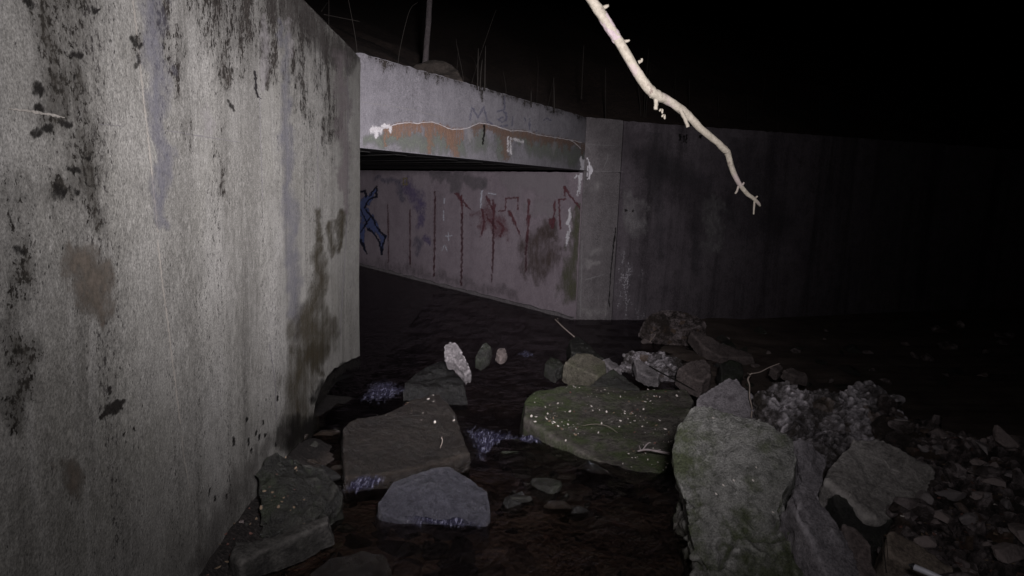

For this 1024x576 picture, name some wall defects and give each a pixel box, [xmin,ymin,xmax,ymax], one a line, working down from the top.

water stain [29,0,103,232]
water stain [155,0,586,452]
rust [383,122,585,159]